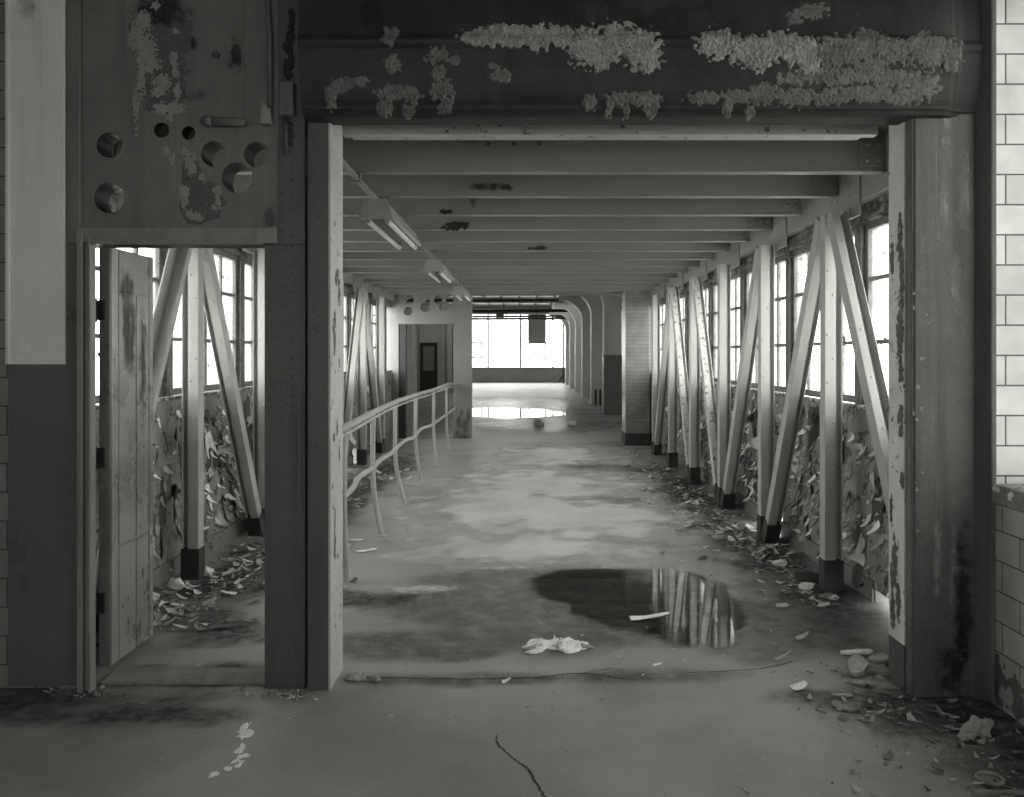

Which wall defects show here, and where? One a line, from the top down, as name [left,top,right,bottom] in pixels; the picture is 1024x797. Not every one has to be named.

peeling [124,0,194,137]
peeling [324,17,666,121]
peeling [681,2,965,123]
peeling [162,145,227,225]
peeling [878,197,930,438]
peeling [153,406,182,571]
peeling [204,404,245,550]
peeling [244,394,253,461]
peeling [735,395,758,504]
peeling [782,404,820,559]
crack [496,735,546,797]